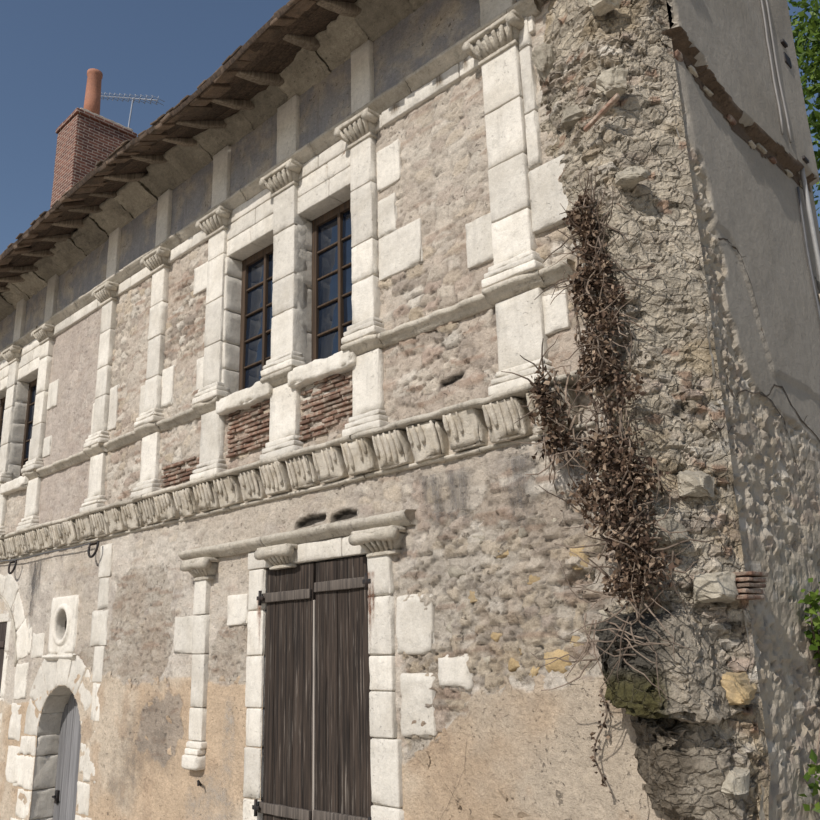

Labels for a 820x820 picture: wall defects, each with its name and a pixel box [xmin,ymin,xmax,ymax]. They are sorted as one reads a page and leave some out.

spalling [393,0,816,820]
crack [718,238,765,338]